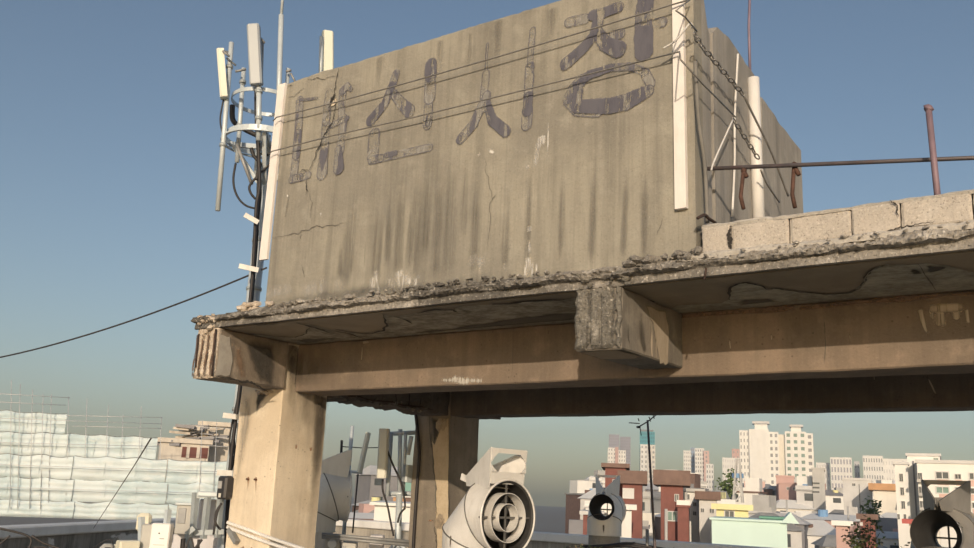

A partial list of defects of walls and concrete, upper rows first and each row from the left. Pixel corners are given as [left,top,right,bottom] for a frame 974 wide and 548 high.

crack [278,70,341,237]
peeling [192,314,233,376]
spalling [236,270,561,311]
peeling [336,246,709,359]
peeling [647,263,974,365]